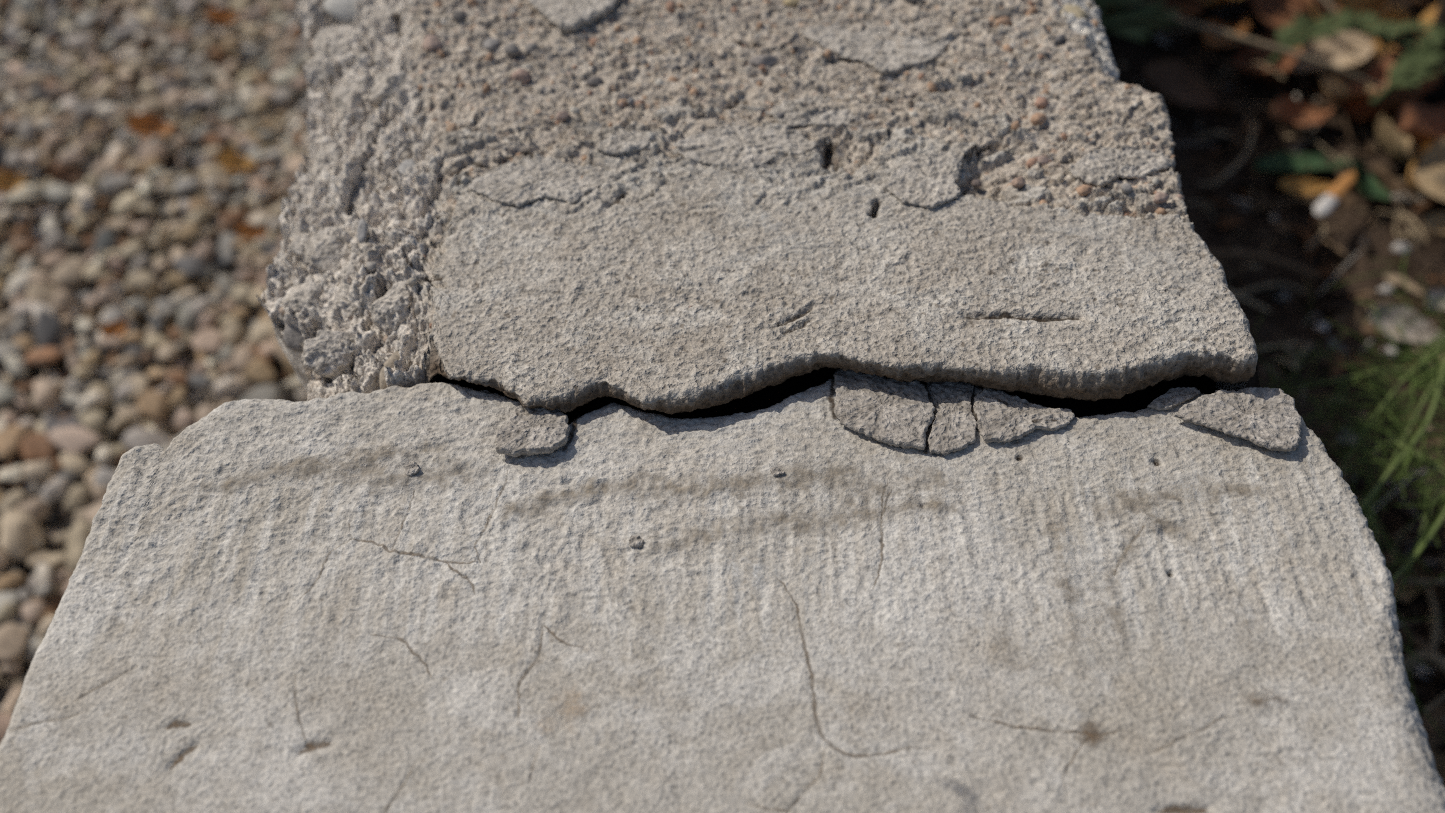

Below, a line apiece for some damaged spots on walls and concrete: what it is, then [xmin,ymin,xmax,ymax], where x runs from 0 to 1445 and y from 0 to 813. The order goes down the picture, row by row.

peeling [391,0,1185,216]
crack [441,377,519,401]
spalling [495,405,570,458]
crack [562,367,840,451]
crack [884,364,1261,454]
crack [757,577,928,812]